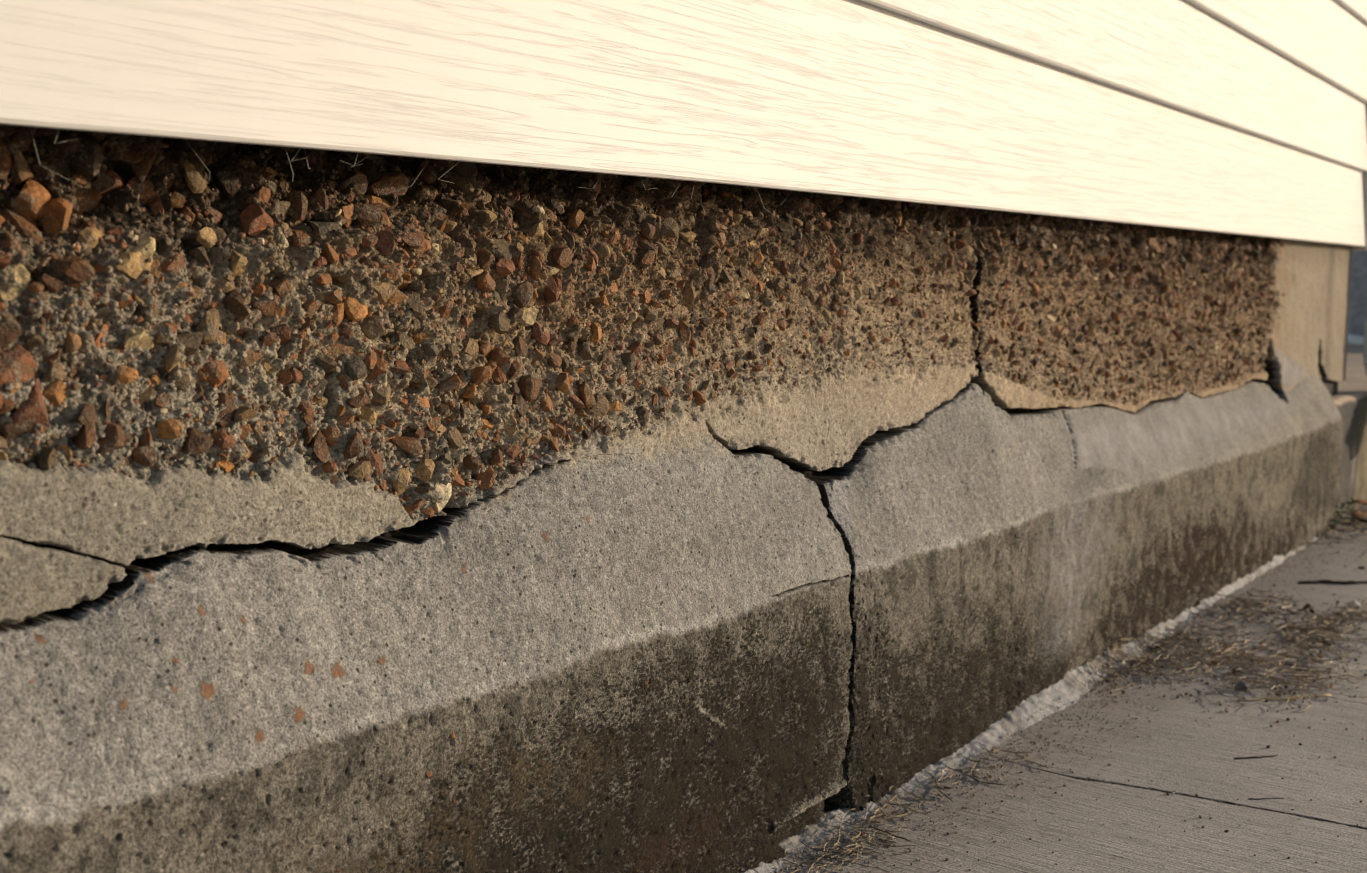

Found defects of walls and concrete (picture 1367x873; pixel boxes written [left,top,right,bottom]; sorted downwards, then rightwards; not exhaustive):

spalling [0,124,1281,522]
crack [0,459,571,631]